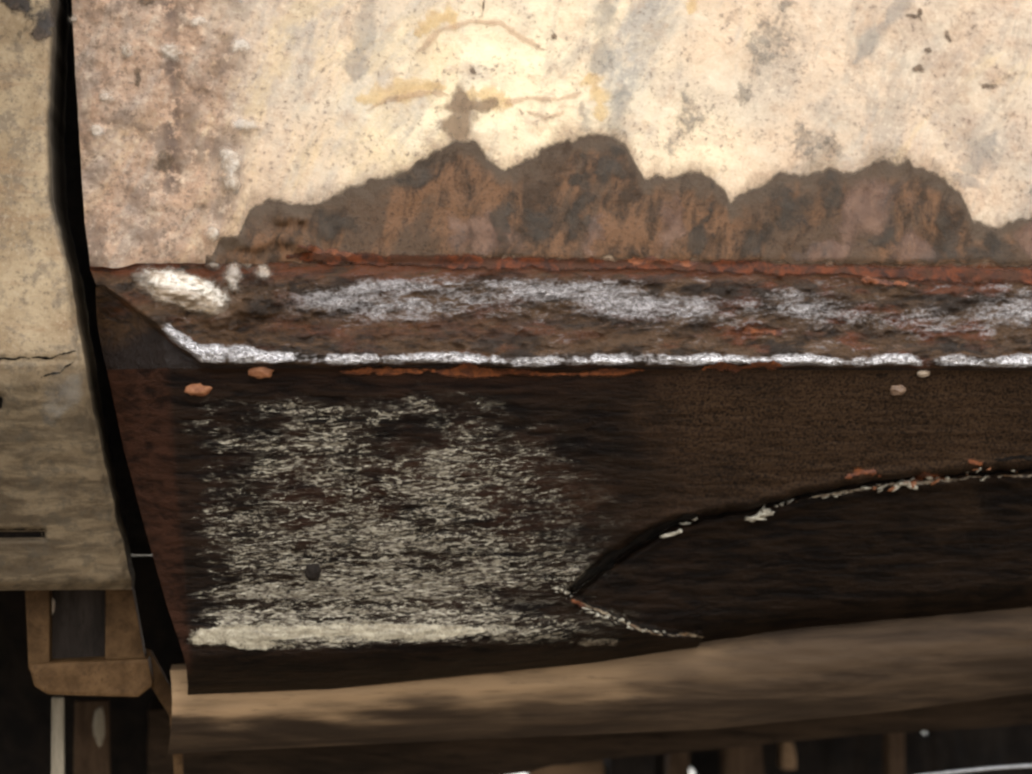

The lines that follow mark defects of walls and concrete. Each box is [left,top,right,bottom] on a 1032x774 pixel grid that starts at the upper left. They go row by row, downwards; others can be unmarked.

rust [286,245,1032,286]
crack [0,351,76,378]
rust [702,361,783,373]
rust [184,383,212,396]